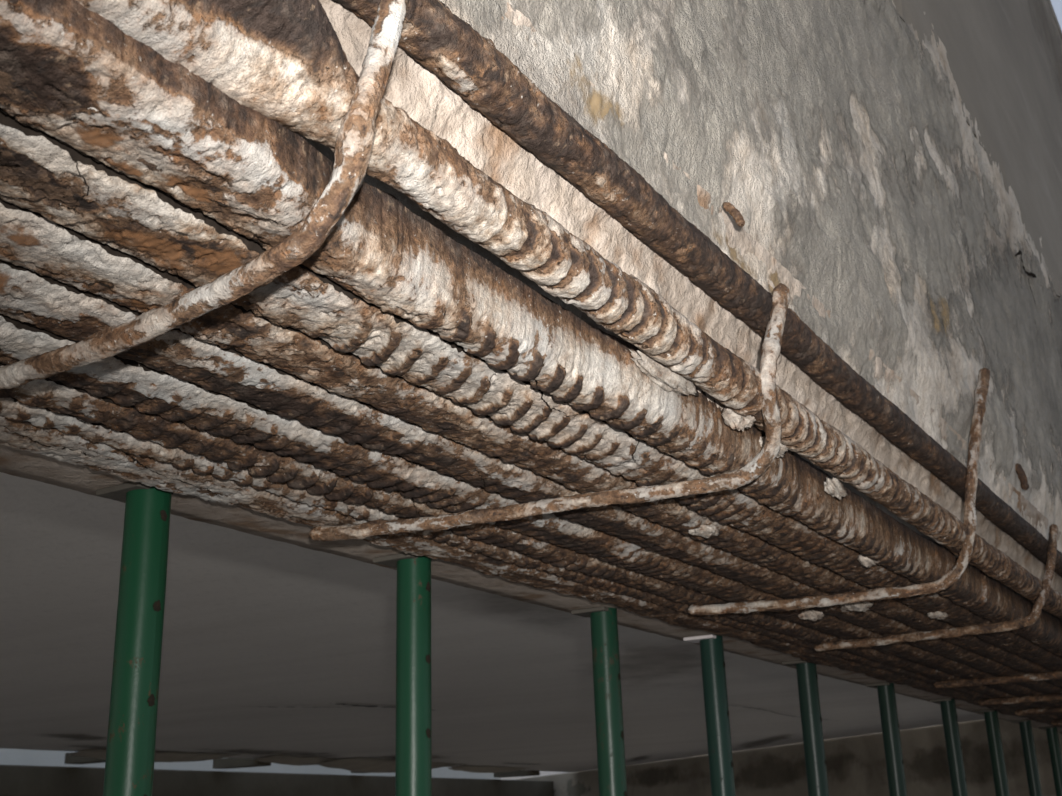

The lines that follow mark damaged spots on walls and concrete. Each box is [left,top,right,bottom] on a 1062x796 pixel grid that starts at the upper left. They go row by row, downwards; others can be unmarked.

spalling [334,0,380,26]
corrosion [77,120,143,176]
spalling [0,0,359,367]
corrosion [161,174,210,202]
corrosion [0,226,39,246]
corrosion [106,230,245,275]
corrosion [0,273,9,293]
corrosion [132,299,162,312]
spalling [0,97,765,527]
spalling [398,0,1062,577]
spalling [363,384,1062,728]
peeling [255,755,395,773]